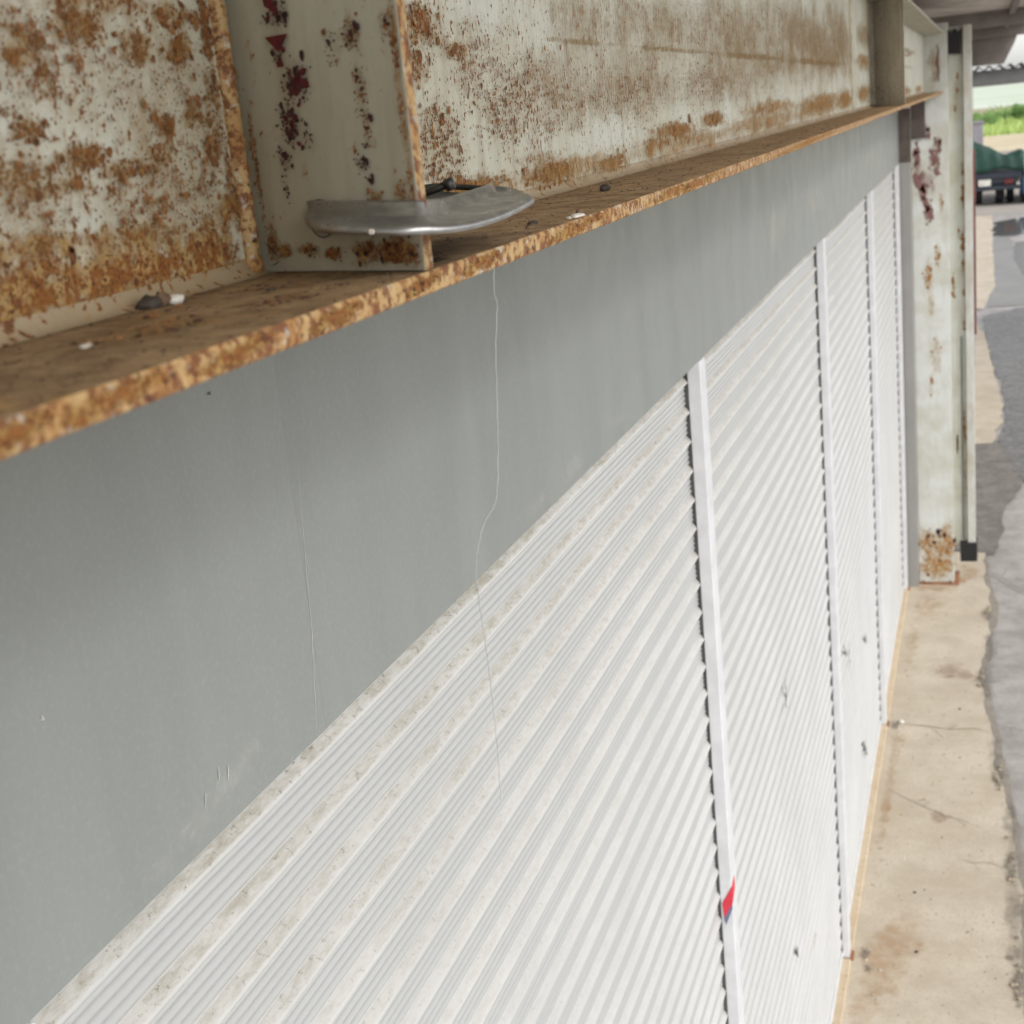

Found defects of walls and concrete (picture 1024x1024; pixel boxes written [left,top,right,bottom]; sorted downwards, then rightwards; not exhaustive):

rust [0,0,244,327]
rust [248,114,447,298]
rust [321,12,376,147]
rust [367,0,872,202]
rust [918,521,956,589]